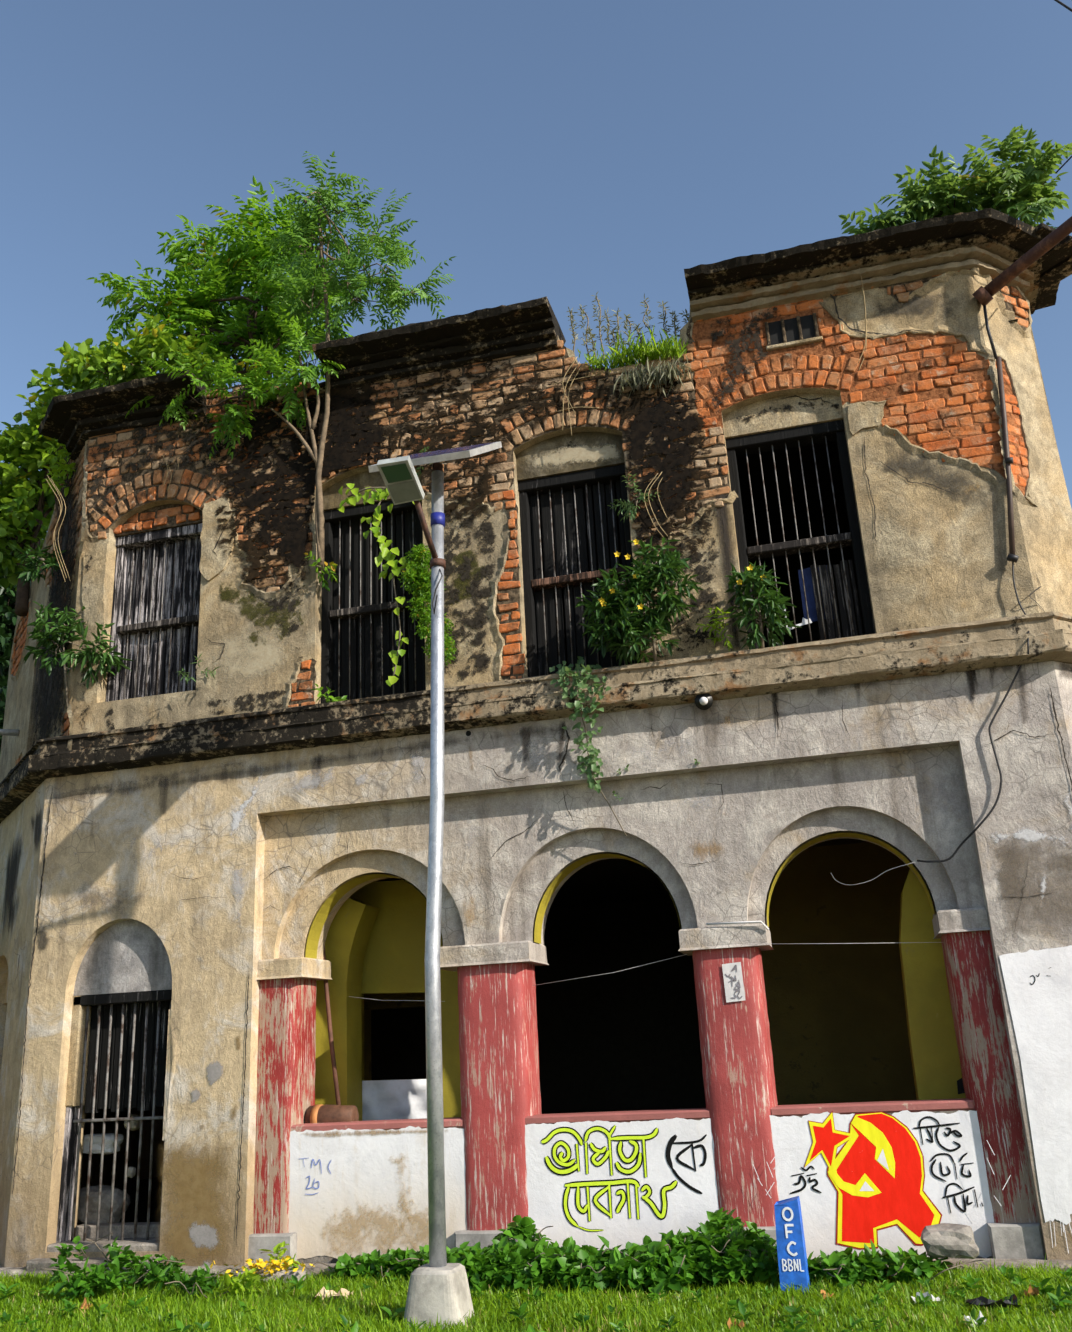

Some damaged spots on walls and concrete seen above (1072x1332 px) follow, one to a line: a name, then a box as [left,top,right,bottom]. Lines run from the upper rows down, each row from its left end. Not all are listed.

flaking render [40,292,1038,681]
flaking render [10,598,32,683]
damp [218,766,288,830]
damp [409,741,452,779]
damp [521,722,564,764]
crack [986,685,1072,790]
damp [2,814,41,929]